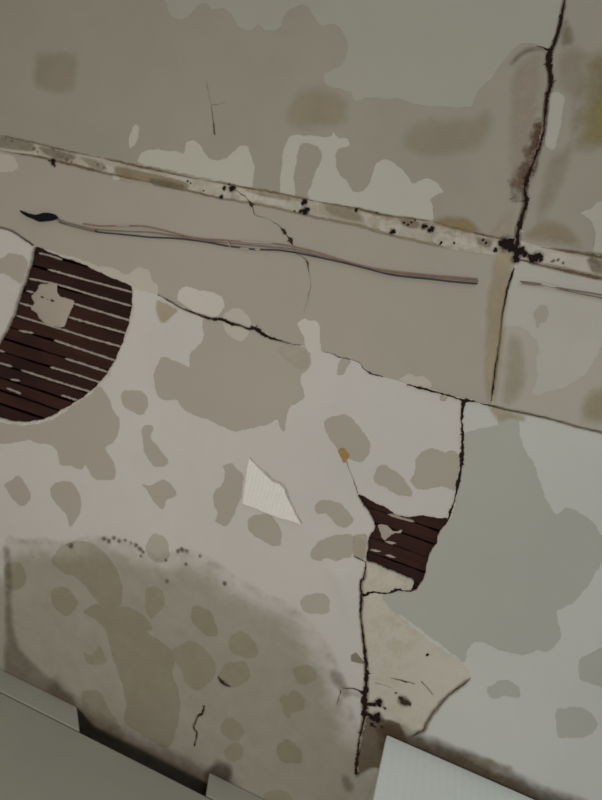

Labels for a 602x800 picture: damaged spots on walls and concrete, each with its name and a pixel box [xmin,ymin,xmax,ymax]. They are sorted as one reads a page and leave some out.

crack [236,190,311,296]
crack [407,0,602,520]
spalling [0,245,133,481]
crack [157,294,301,346]
crack [323,351,382,377]
leakage [354,535,366,559]
peeling [357,305,602,738]
crack [336,556,470,775]
crack [193,706,205,746]
leakage [207,766,229,781]